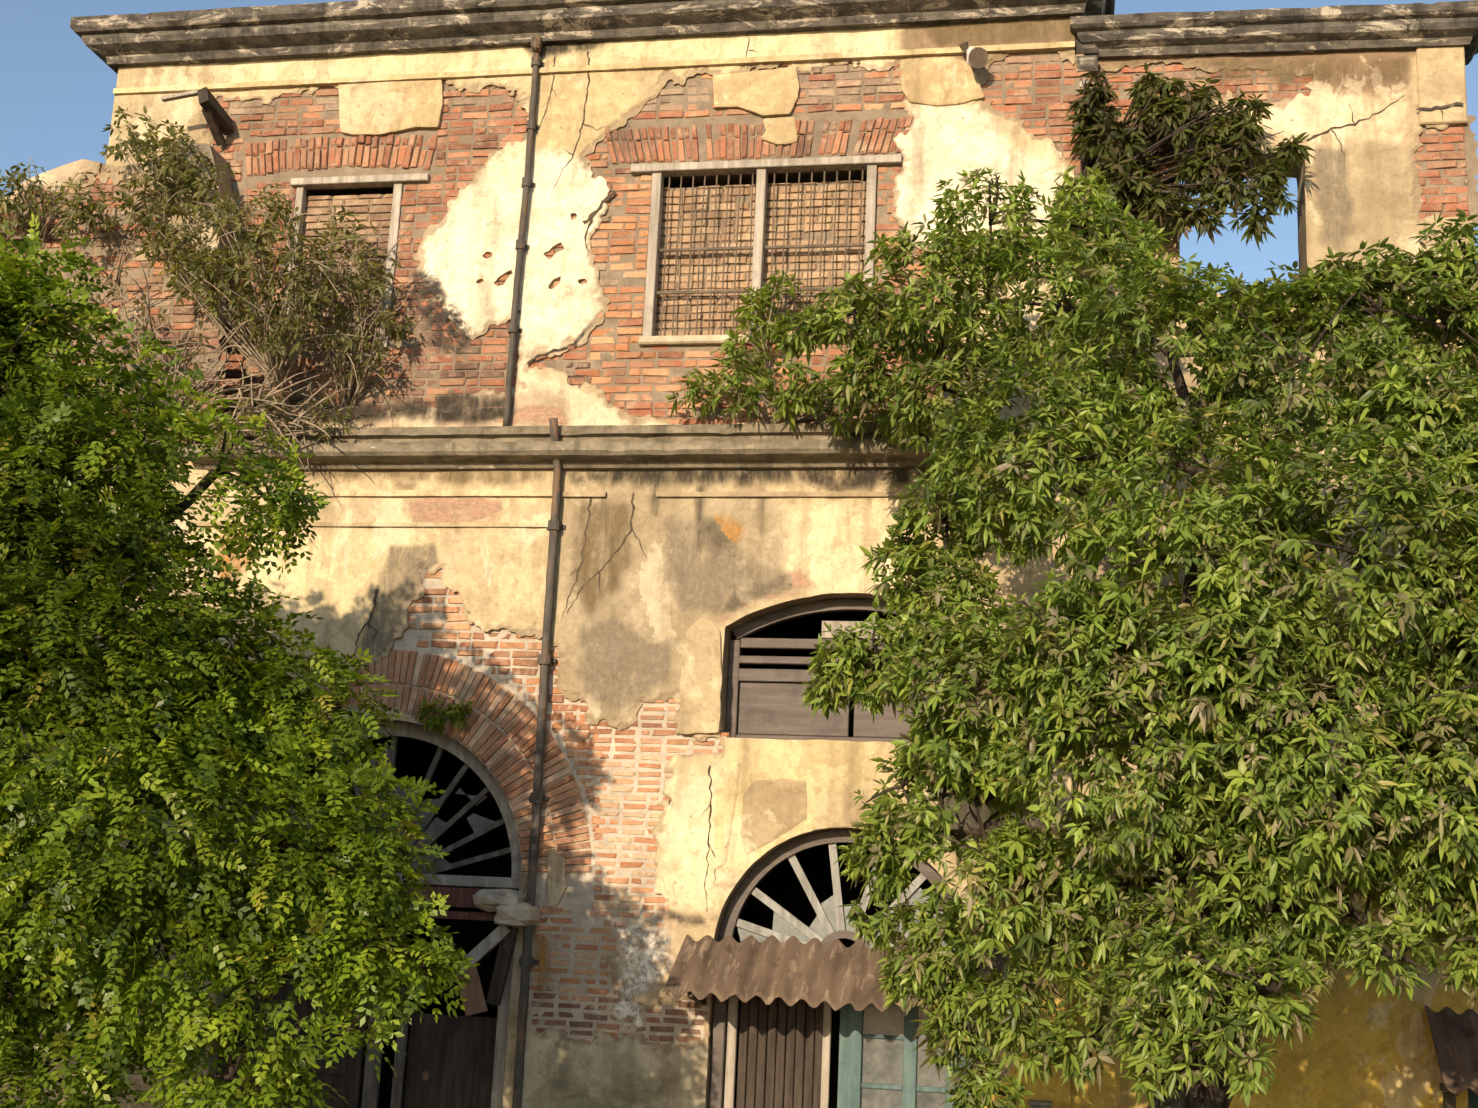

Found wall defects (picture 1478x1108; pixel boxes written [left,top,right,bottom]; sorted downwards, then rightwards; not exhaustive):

crack [1306,95,1463,160]
flaking render [1413,115,1478,223]
flaking render [203,61,952,425]
crack [562,493,646,617]
damp [578,506,668,702]
damp [572,469,931,610]
flaking render [326,562,730,1047]